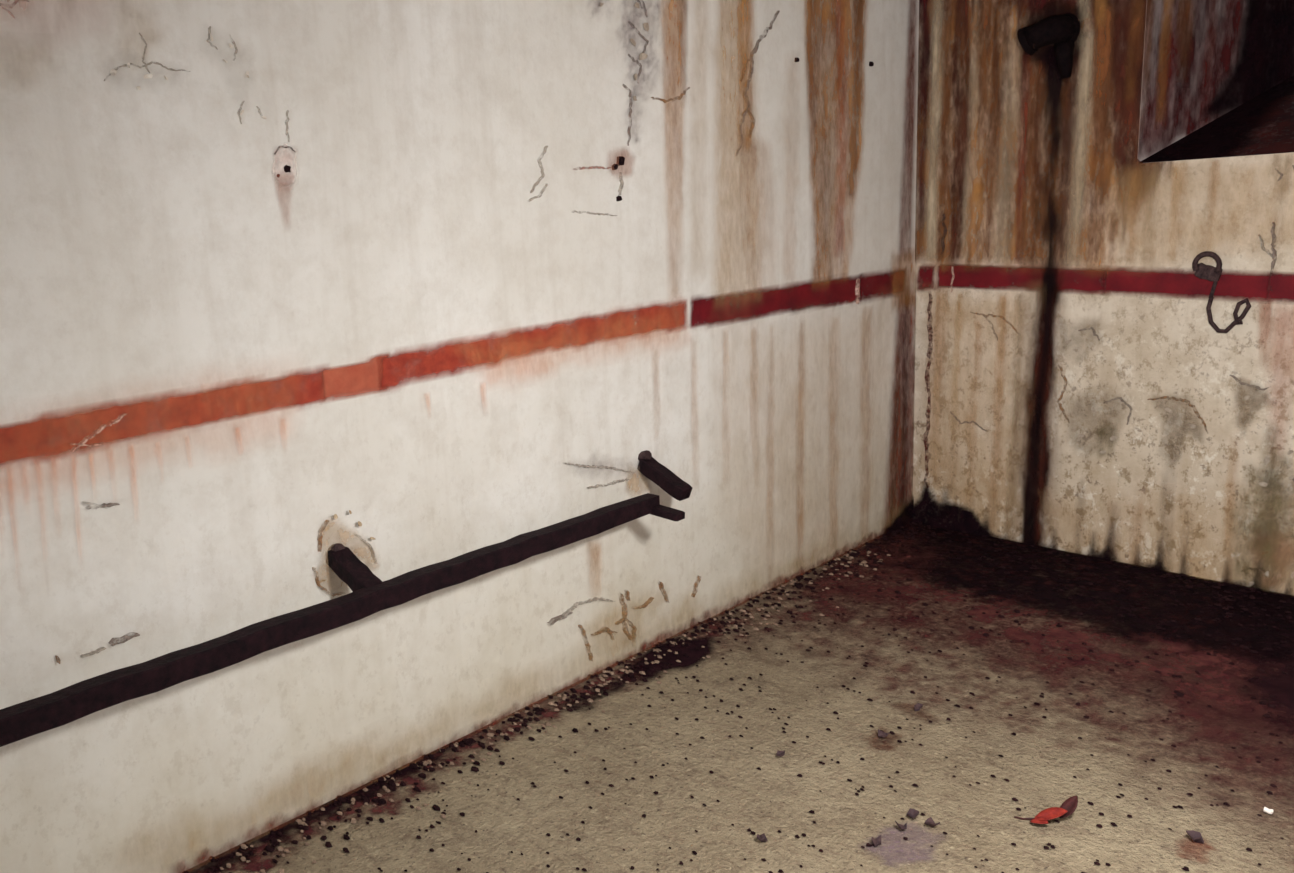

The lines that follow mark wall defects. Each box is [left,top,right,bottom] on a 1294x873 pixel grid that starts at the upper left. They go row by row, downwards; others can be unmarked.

leakage [623,0,649,146]
rust [651,0,690,108]
rust [806,0,865,282]
flaking render [312,567,342,597]
flaking render [317,510,376,561]